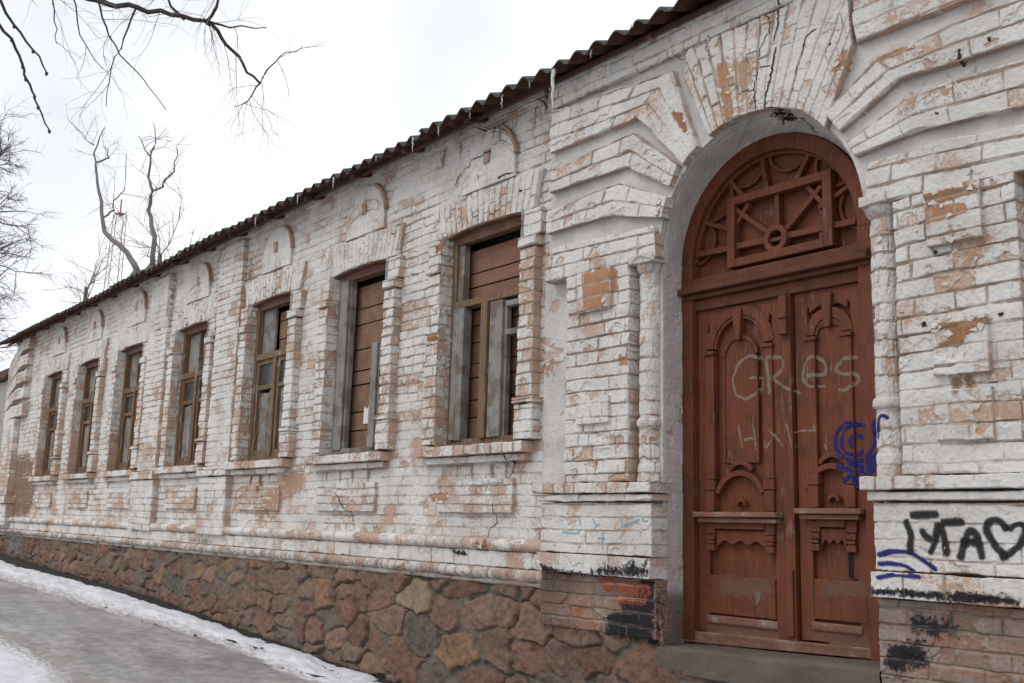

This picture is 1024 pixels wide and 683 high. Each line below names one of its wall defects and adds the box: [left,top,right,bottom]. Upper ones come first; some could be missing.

spalling [717,46,762,121]
crack [742,0,816,133]
spalling [671,110,689,134]
spalling [923,183,996,273]
spalling [581,268,619,309]
spalling [935,316,993,348]
spalling [599,578,651,607]